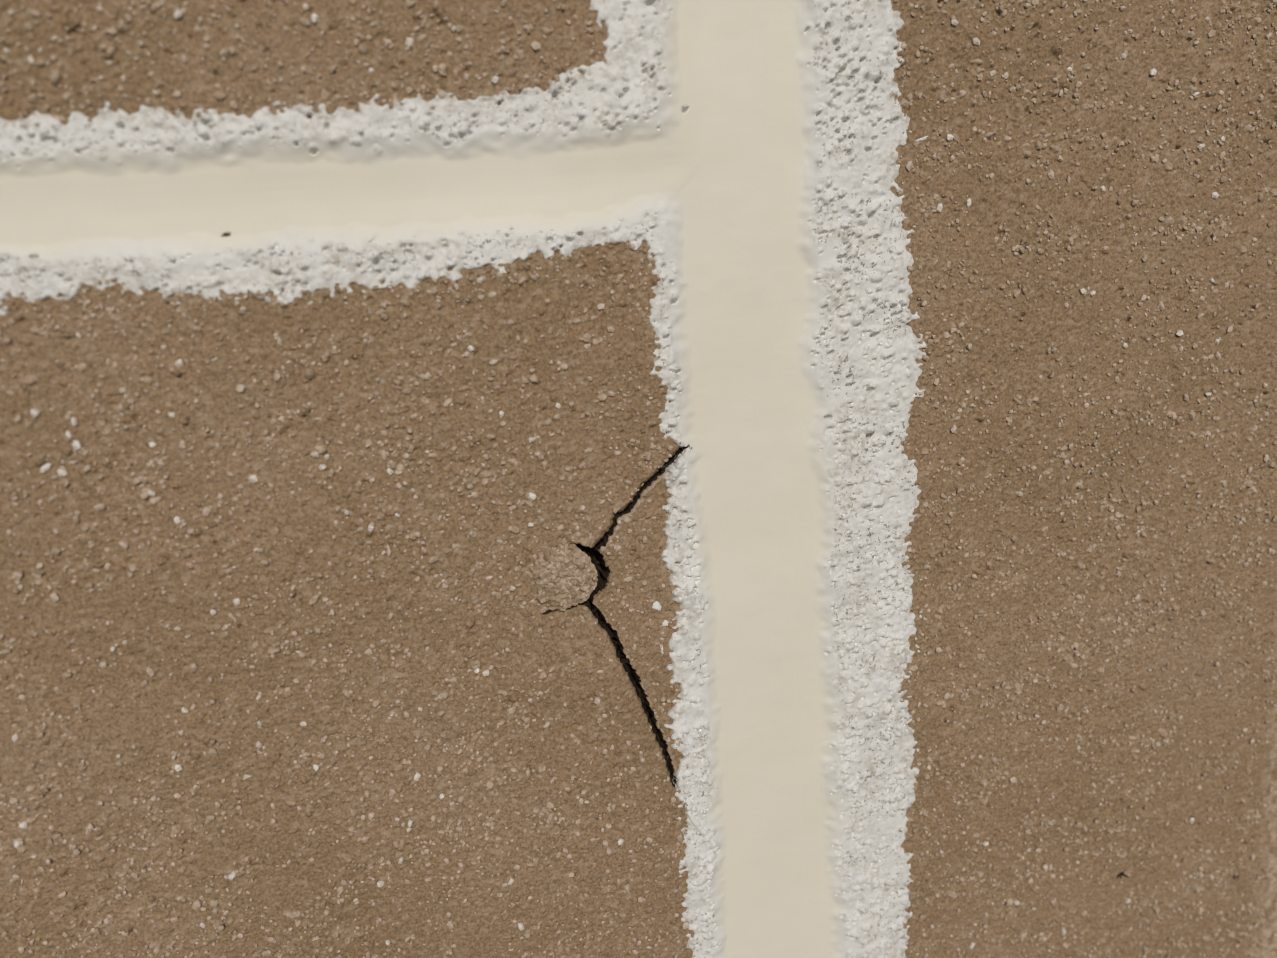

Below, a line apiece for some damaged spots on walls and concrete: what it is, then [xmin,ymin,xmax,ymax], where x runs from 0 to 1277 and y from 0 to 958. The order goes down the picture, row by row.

crack [543,447,688,787]